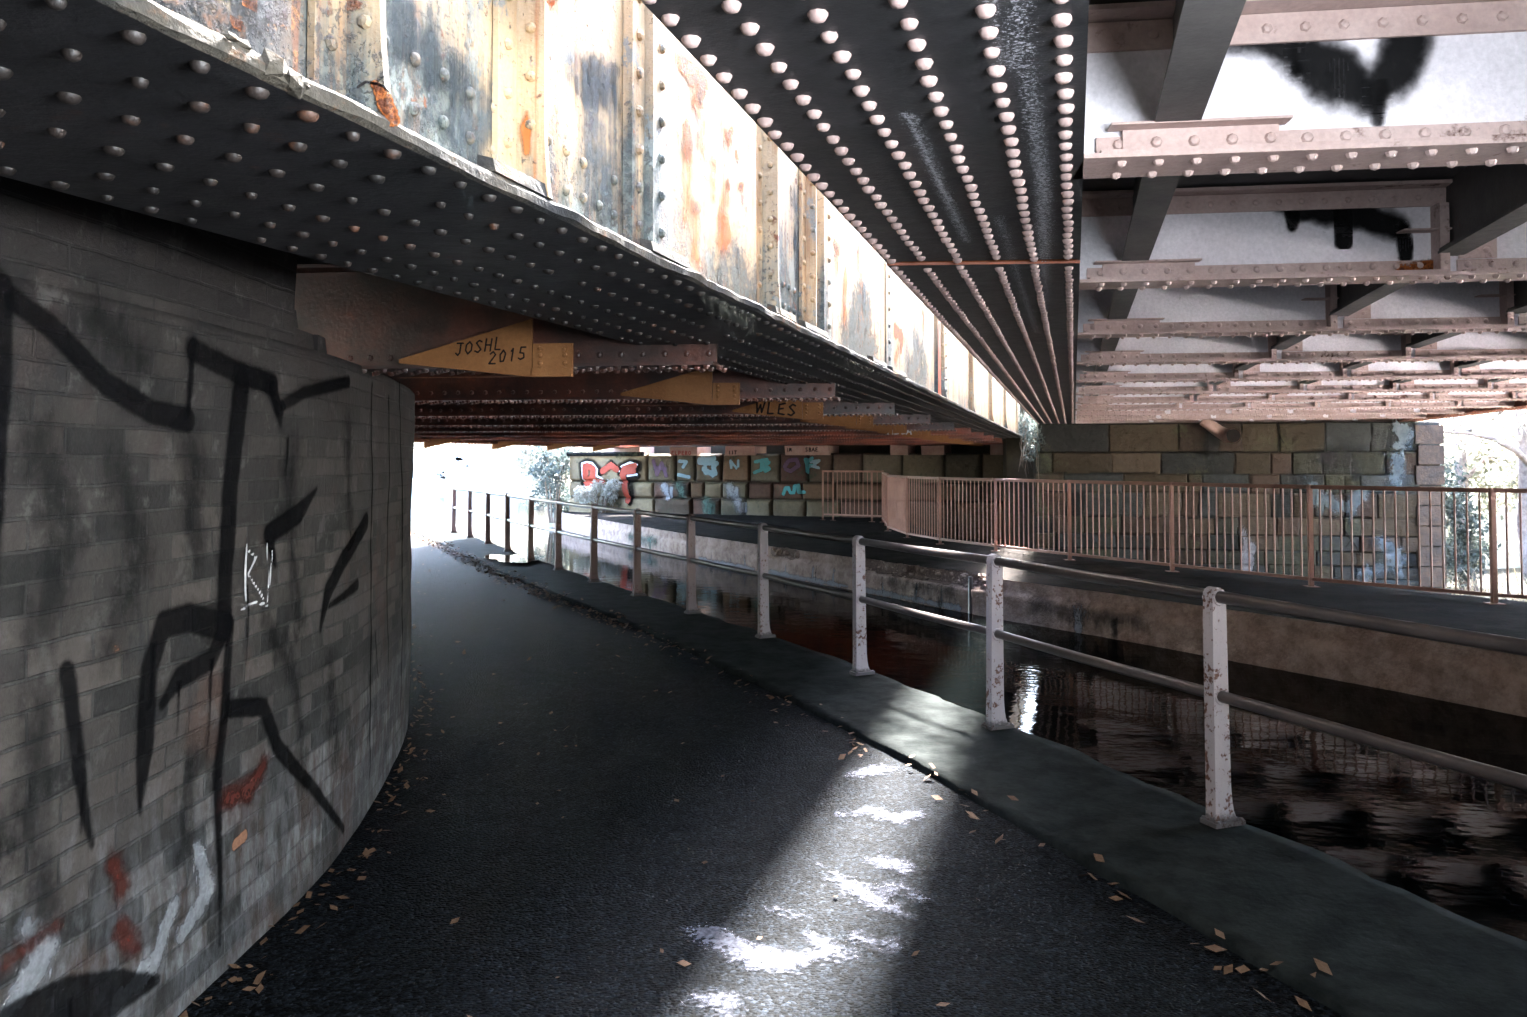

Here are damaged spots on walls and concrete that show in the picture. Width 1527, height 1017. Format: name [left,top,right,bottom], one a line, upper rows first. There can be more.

rust [370,80,400,127]
rust [677,52,743,266]
rust [833,240,860,328]